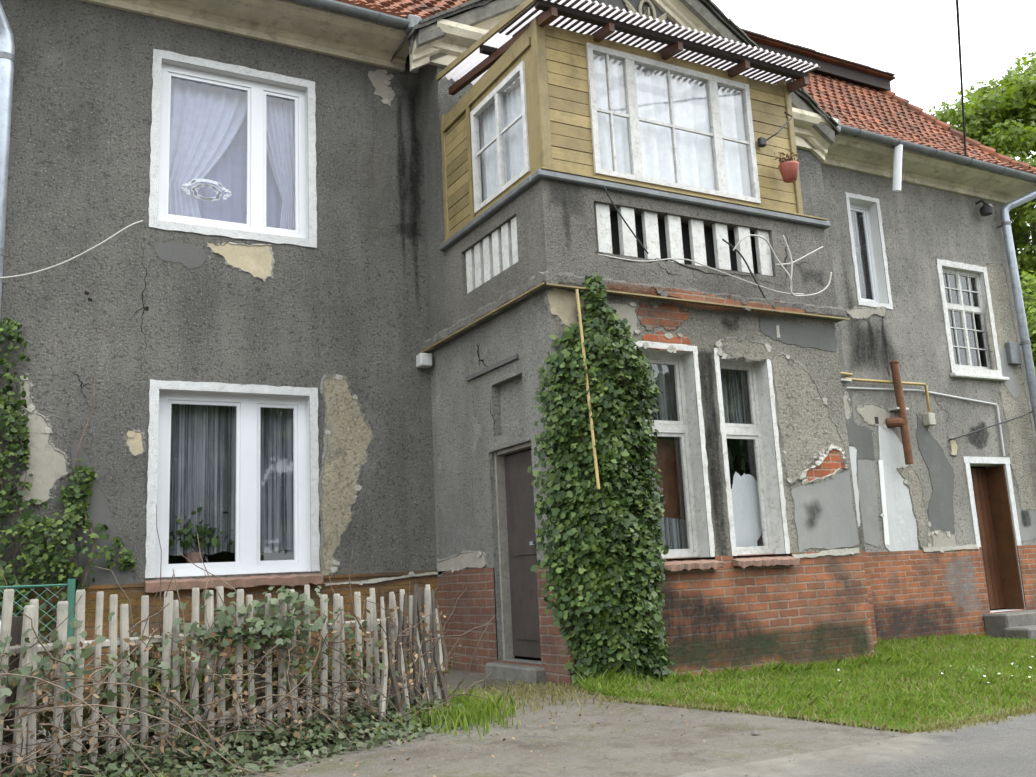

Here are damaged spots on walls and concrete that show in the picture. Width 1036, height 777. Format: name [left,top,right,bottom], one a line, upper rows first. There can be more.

peeling [368,69,395,107]
spalling [206,241,275,283]
crack [129,240,147,374]
spalling [545,288,587,329]
leakage [848,296,894,373]
spalling [602,286,898,485]
spalling [983,261,1036,511]
spalling [123,429,147,458]
spalling [318,371,375,575]
spalling [878,460,958,553]
spalling [948,436,958,457]
spalling [431,550,488,577]